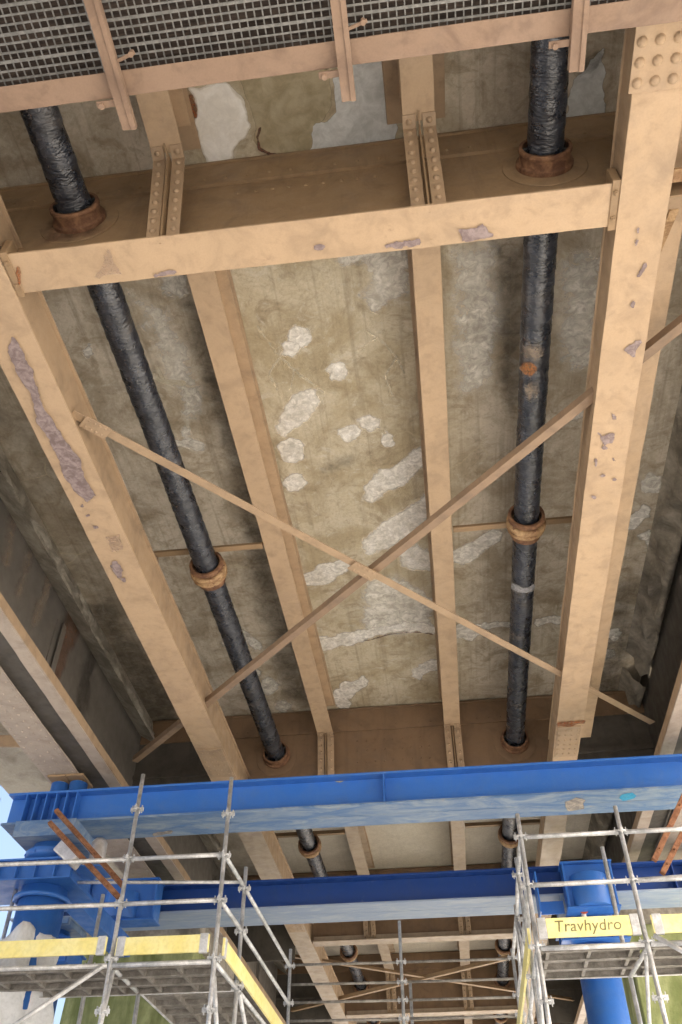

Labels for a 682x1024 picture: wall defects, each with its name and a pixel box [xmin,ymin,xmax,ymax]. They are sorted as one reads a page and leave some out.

peeling [566,49,606,117]
peeling [188,61,398,162]
peeling [458,224,493,242]
water stain [282,326,312,357]
peeling [624,340,642,357]
peeling [8,337,98,529]
water stain [277,390,320,491]
water stain [338,415,395,447]
water stain [364,448,423,502]
peeling [594,432,617,481]
water stain [362,496,430,571]
water stain [304,560,350,585]